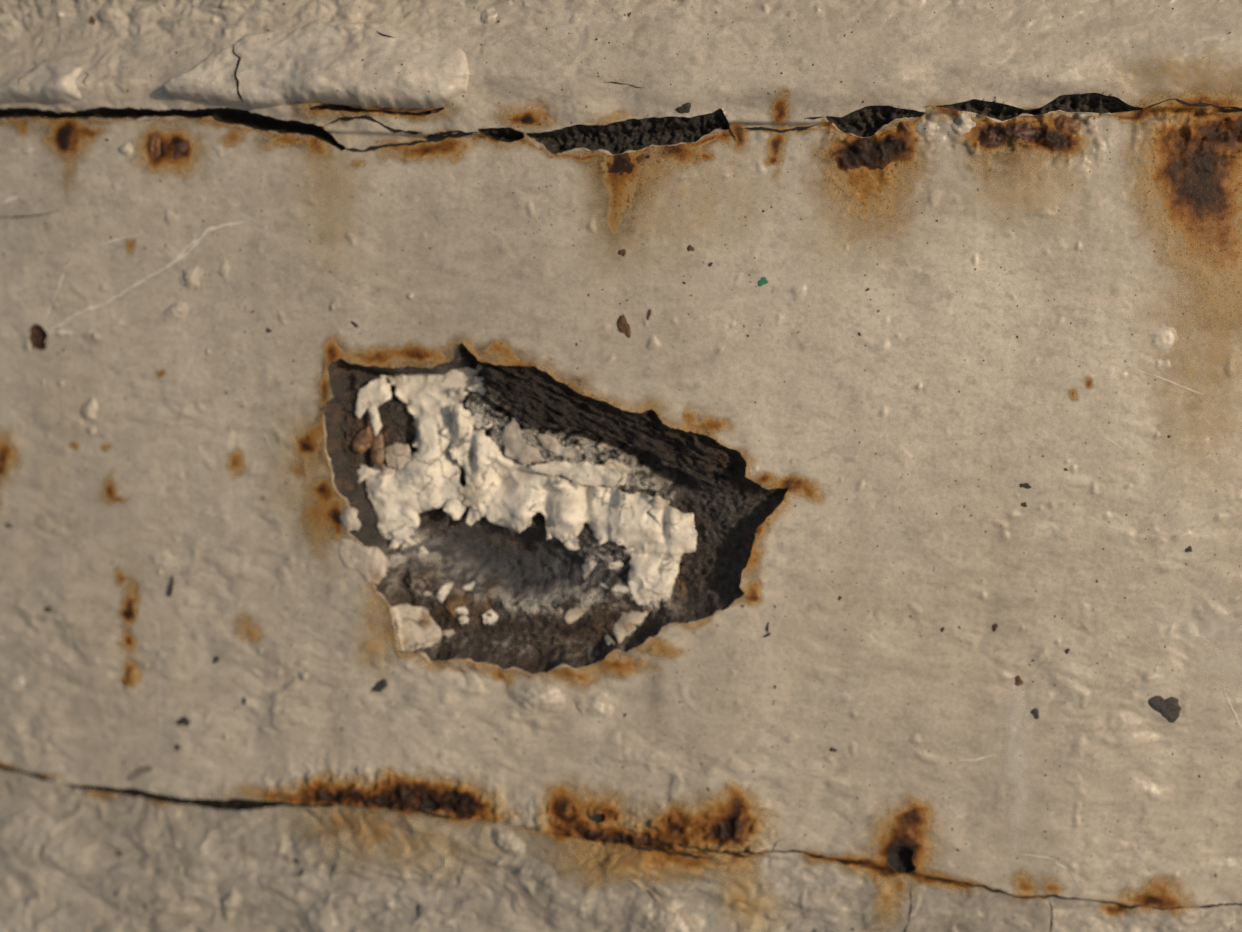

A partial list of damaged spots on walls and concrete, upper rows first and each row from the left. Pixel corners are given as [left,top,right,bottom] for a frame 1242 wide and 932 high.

rust [0,117,330,175]
crack [0,43,1242,155]
rust [298,89,1242,326]
spalling [323,343,788,676]
rust [292,336,823,606]
rust [114,568,142,687]
crack [0,766,486,821]
rust [238,768,511,824]
rust [533,783,768,885]
crack [586,827,859,865]
rust [806,797,980,920]
crack [904,876,1242,932]